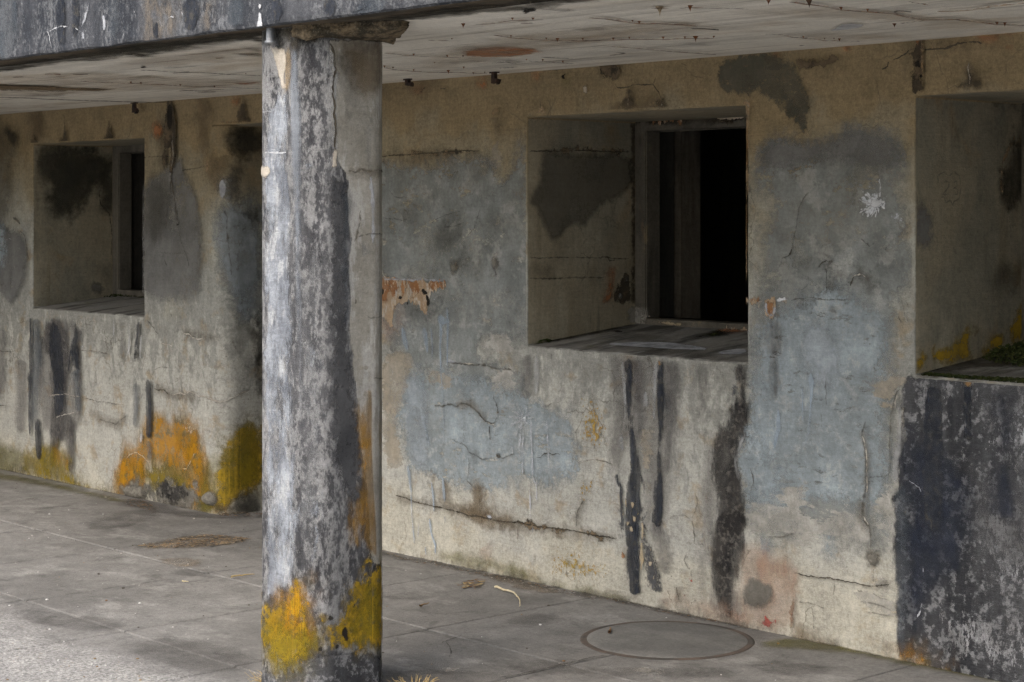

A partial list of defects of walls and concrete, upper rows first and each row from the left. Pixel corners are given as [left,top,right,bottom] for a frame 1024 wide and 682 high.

leakage [530,145,632,239]
leakage [0,0,316,595]
peeling [329,39,446,564]
crack [435,403,560,460]
crack [396,481,614,542]
leakage [615,359,664,595]
leakage [702,349,749,618]
crack [798,573,889,627]
leakage [261,648,382,682]